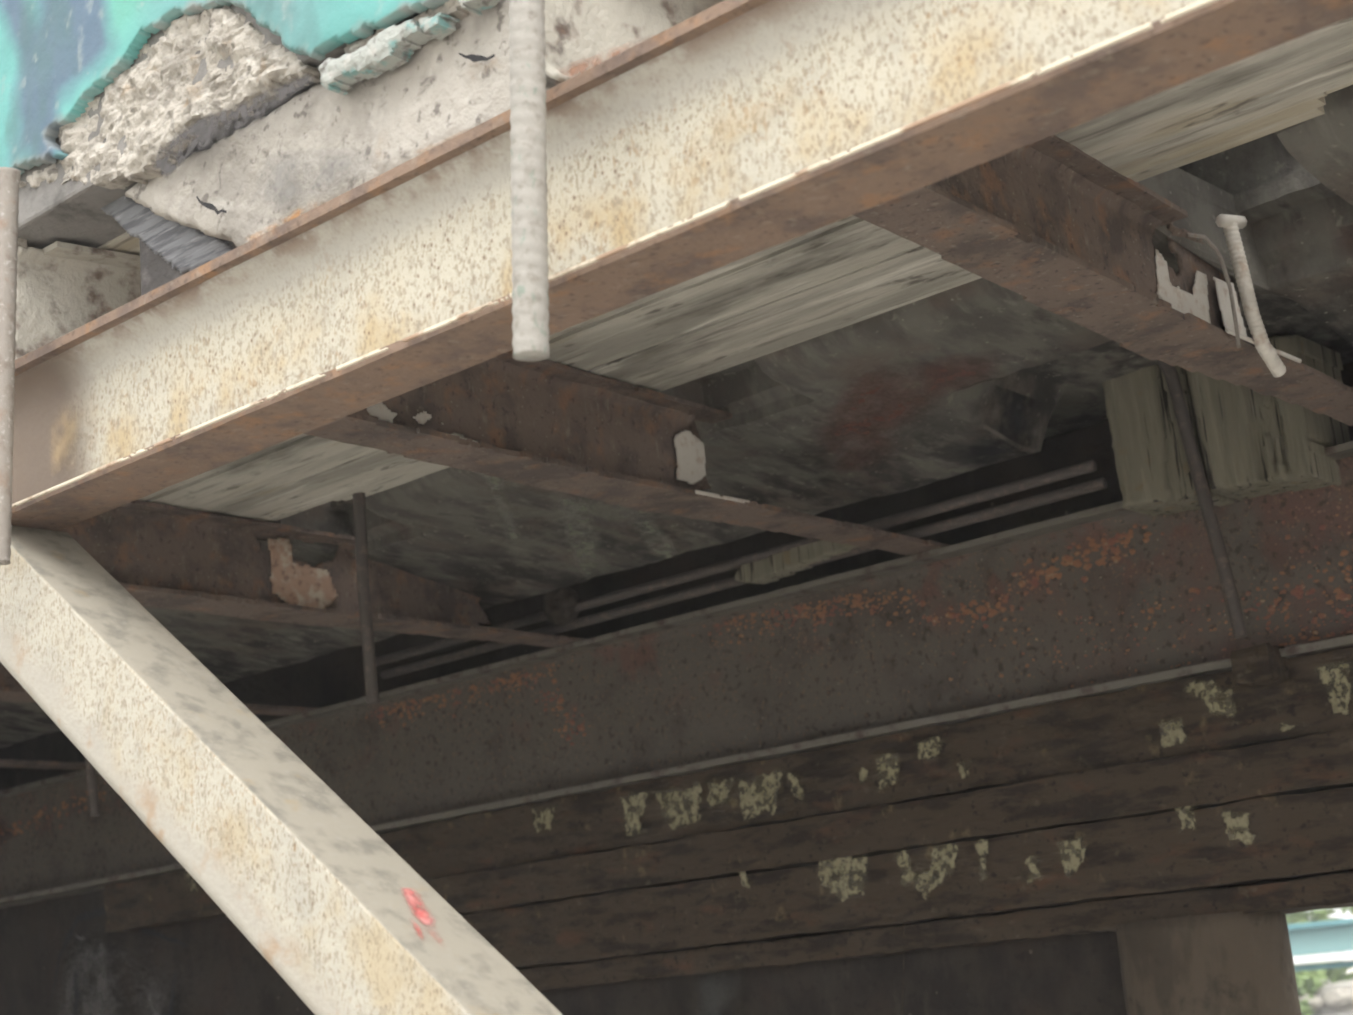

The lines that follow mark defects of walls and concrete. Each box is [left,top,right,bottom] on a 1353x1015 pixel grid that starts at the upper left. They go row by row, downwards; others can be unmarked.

spalling [19,0,500,190]
peeling [1155,249,1255,344]
peeling [1274,348,1302,363]
peeling [367,402,397,423]
peeling [413,411,443,425]
peeling [674,430,750,503]
peeling [268,537,338,609]
rust [687,524,1164,677]
rust [1241,514,1353,646]